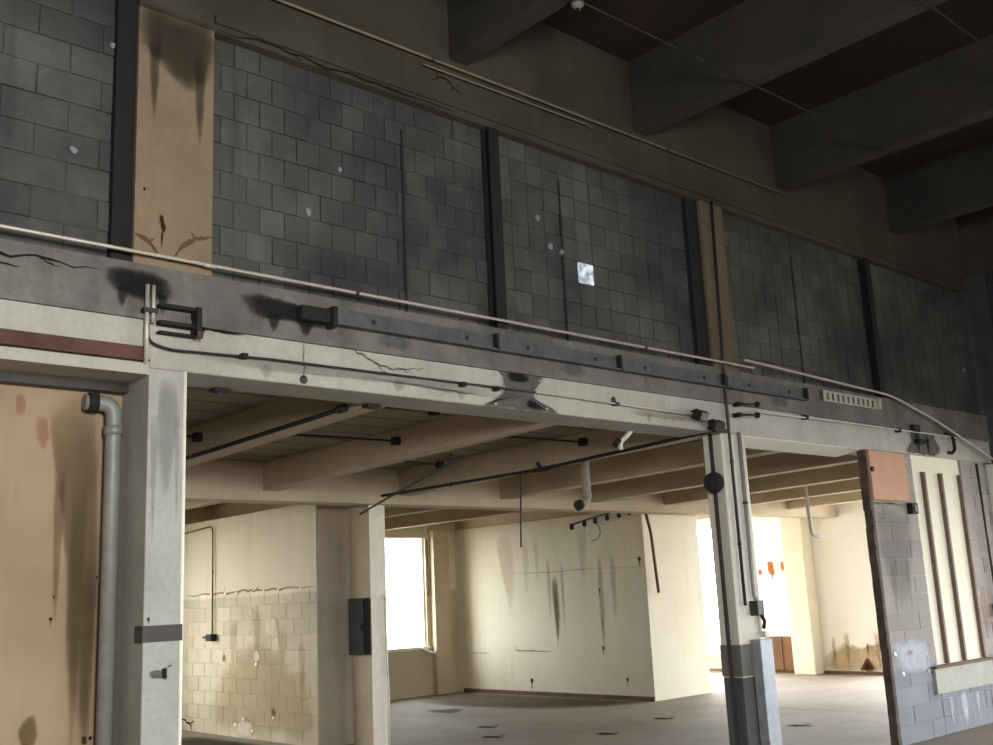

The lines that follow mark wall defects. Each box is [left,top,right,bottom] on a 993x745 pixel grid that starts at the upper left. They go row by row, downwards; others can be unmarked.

crack [0,251,97,269]